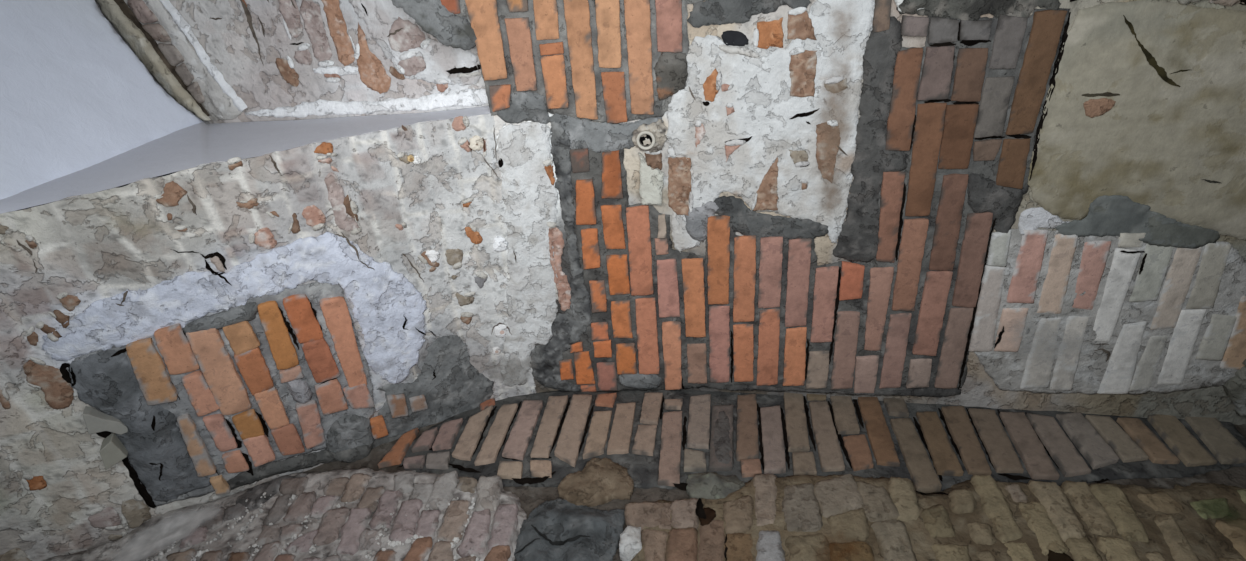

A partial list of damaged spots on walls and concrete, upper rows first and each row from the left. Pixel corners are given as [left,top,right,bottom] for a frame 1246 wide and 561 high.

crack [170,249,231,285]
peeling [23,142,427,409]
peeling [244,0,571,387]
peeling [638,0,875,253]
peeling [1018,207,1070,235]